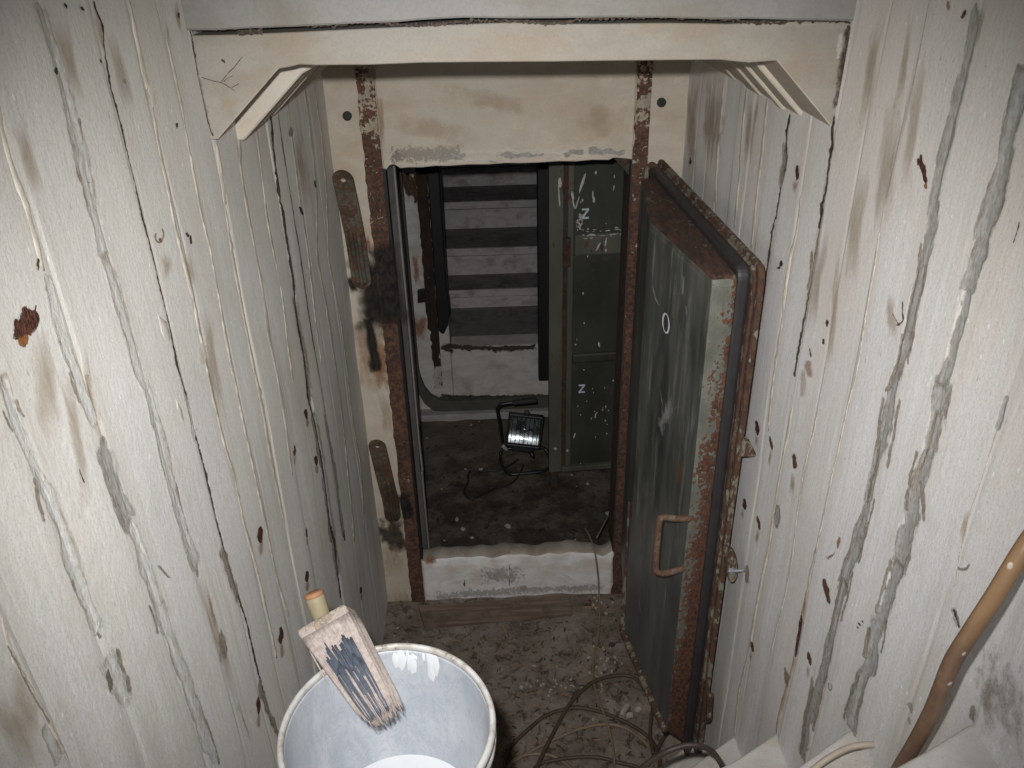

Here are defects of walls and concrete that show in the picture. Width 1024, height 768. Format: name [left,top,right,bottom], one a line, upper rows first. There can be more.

crack [307,17,851,29]
spalling [0,107,220,765]
crack [93,1,279,736]
corrosion [367,345,386,382]
peeling [411,146,625,165]
crack [793,117,835,377]
spalling [799,4,1024,762]